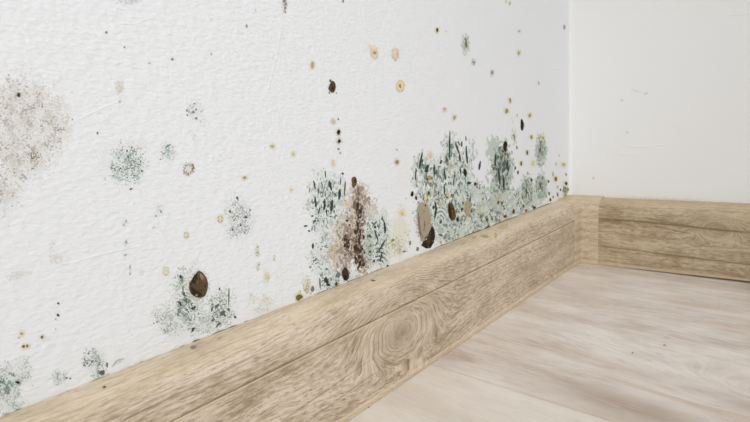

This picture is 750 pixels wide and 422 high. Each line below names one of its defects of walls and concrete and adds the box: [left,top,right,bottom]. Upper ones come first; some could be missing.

mould [0,61,77,227]
mould [91,134,177,196]
leakage [220,192,279,285]
leakage [295,96,569,301]
leakage [151,259,276,347]
mould [0,331,37,416]
mould [81,348,125,382]